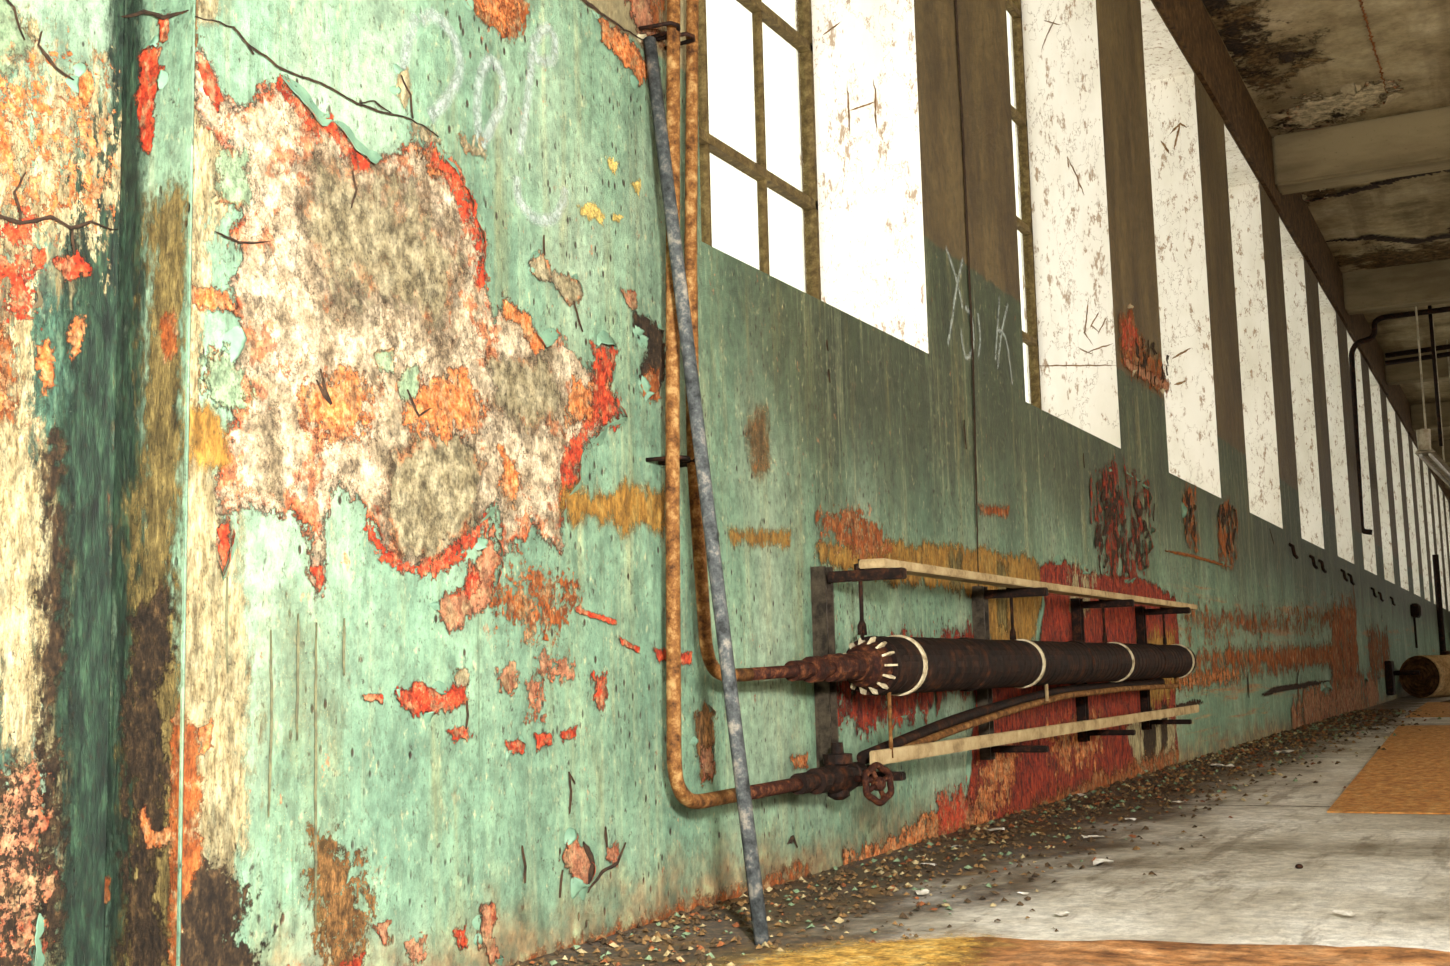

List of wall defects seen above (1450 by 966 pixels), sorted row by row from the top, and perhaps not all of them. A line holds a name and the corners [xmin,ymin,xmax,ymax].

crack [6,0,75,80]
crack [121,9,439,137]
crack [582,0,643,40]
water stain [1202,0,1334,132]
peeling [0,3,171,398]
peeling [188,0,628,637]
peeling [620,287,666,404]
peeling [1038,455,1179,645]
peeling [362,667,477,745]
peeling [496,642,610,762]
peeling [837,678,1178,824]
peeling [0,731,75,966]